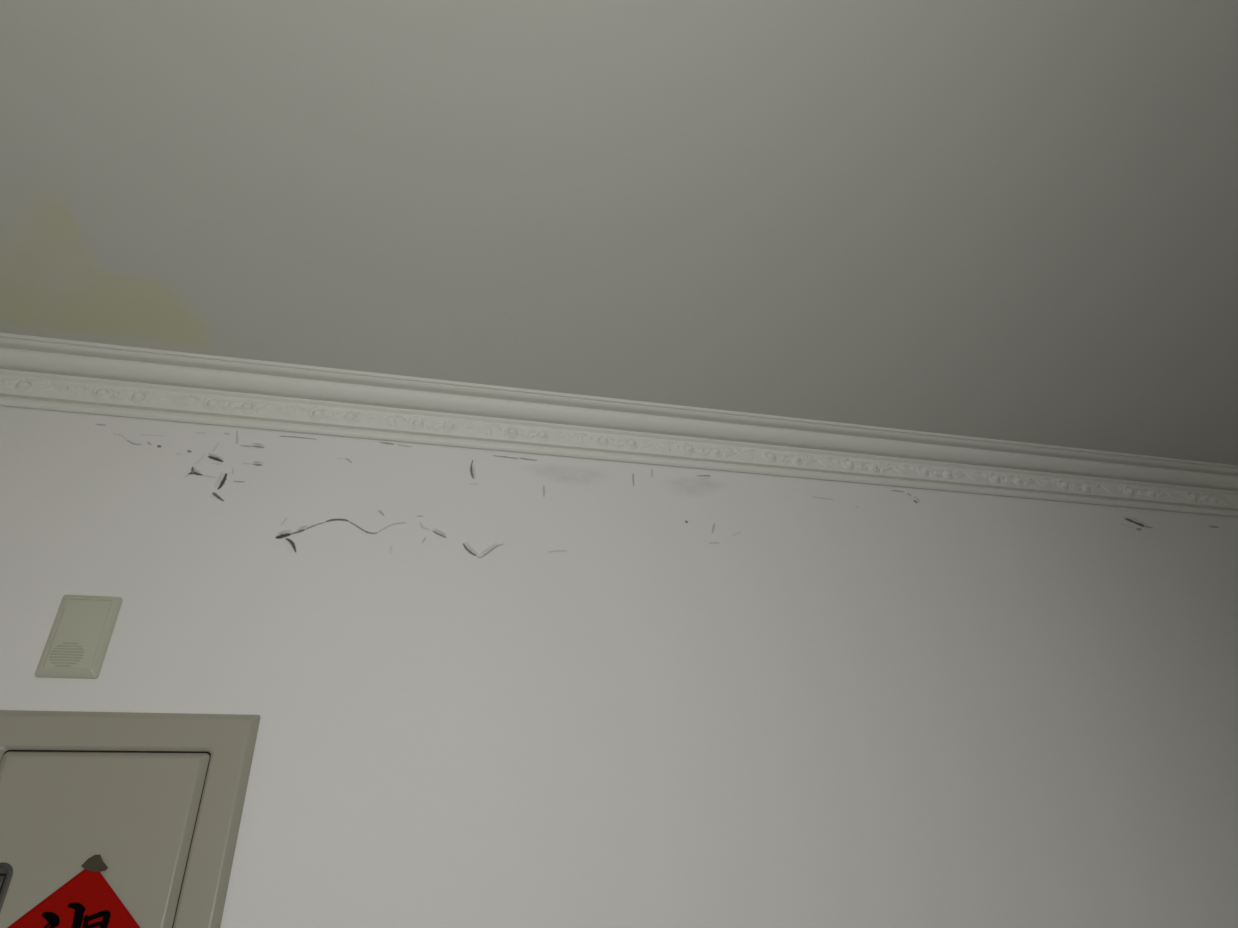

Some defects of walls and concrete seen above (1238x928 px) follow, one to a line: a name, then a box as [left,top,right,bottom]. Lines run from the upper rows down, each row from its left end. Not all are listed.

crack [275,509,504,558]